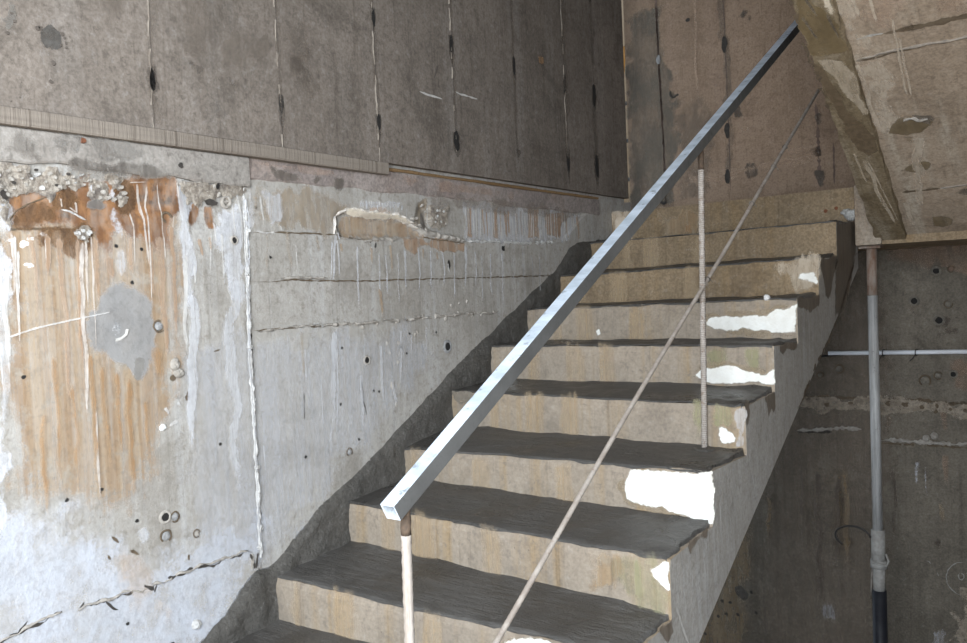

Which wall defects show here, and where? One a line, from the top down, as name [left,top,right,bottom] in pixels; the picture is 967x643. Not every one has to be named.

damp [0,204,20,362]
spalling [0,162,128,248]
damp [69,158,172,179]
damp [179,193,197,344]
spalling [178,181,247,209]
damp [210,200,245,301]
spalling [409,199,450,231]
corrosion [0,174,215,511]
spalling [799,259,967,420]
damp [0,429,13,482]
crack [0,188,263,643]